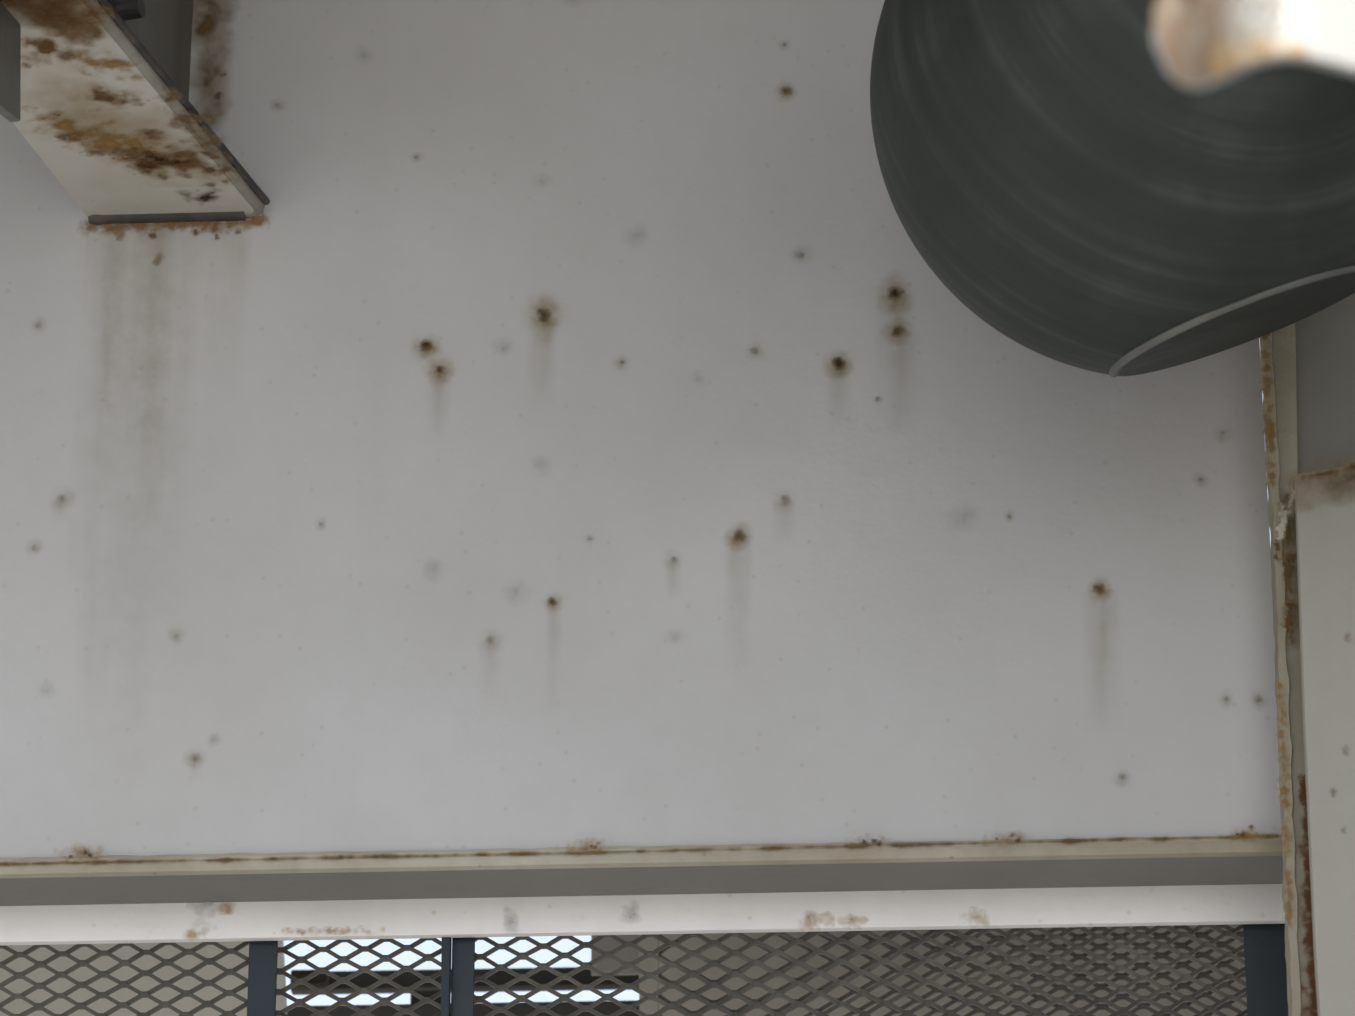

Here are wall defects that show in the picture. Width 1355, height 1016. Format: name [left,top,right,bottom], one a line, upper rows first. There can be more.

rust [0,0,139,79]
rust [1153,0,1307,85]
rust [37,0,235,202]
rust [87,216,267,239]
rust [538,306,550,323]
rust [421,341,435,355]
rust [832,357,846,371]
rust [0,847,161,866]
rust [564,842,646,855]
rust [806,840,979,848]
rust [1219,682,1318,1016]